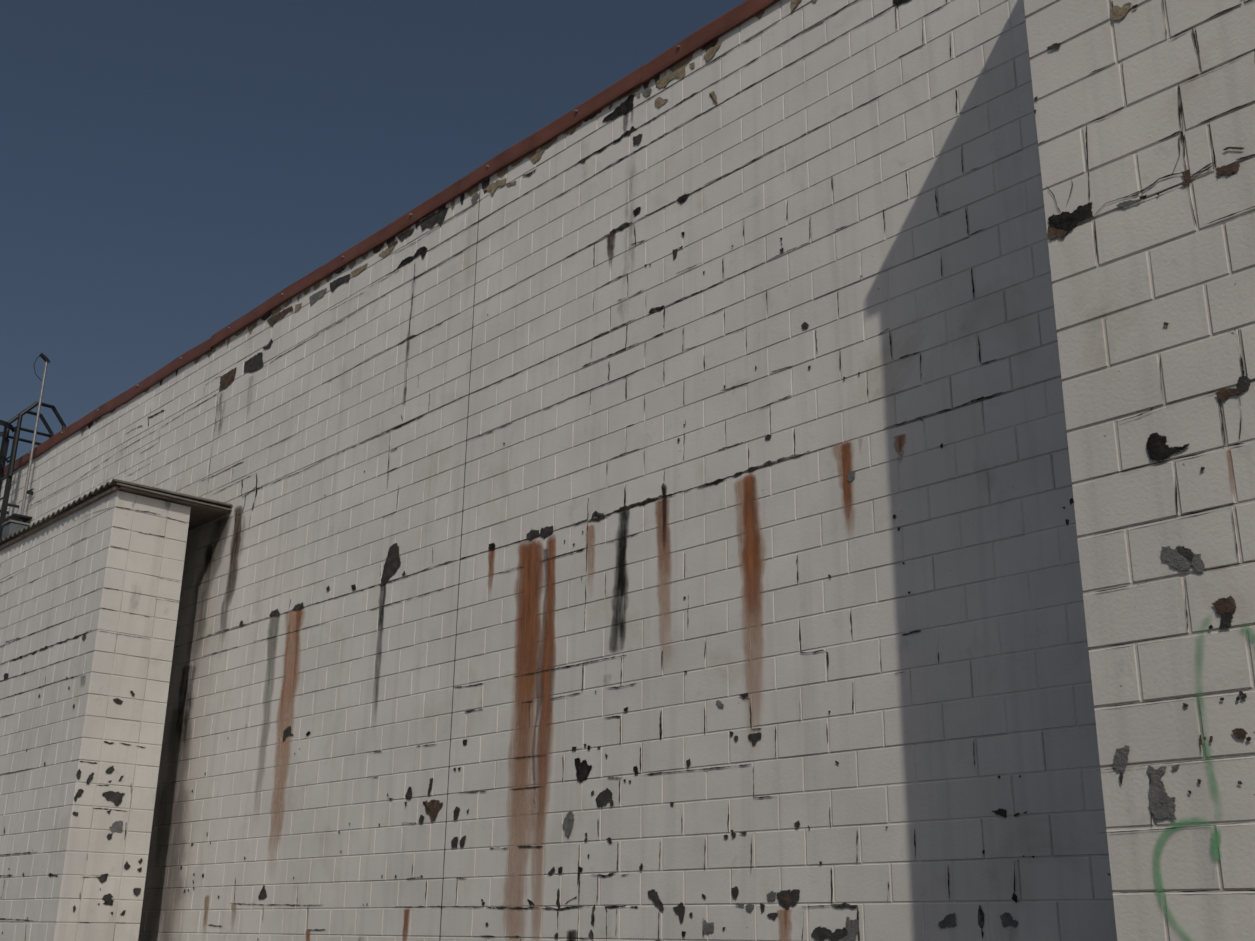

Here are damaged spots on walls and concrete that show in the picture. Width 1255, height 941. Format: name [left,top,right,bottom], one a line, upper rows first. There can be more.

crack [1046,0,1255,261]
peeling [194,38,722,391]
crack [883,173,983,235]
crack [941,255,975,300]
water stain [195,518,227,614]
water stain [612,510,629,650]
corrosion [738,475,763,678]
peeling [72,766,125,840]
water stain [266,616,279,701]
corrosion [273,610,302,832]
corrosion [510,538,555,938]
peeling [572,744,614,807]